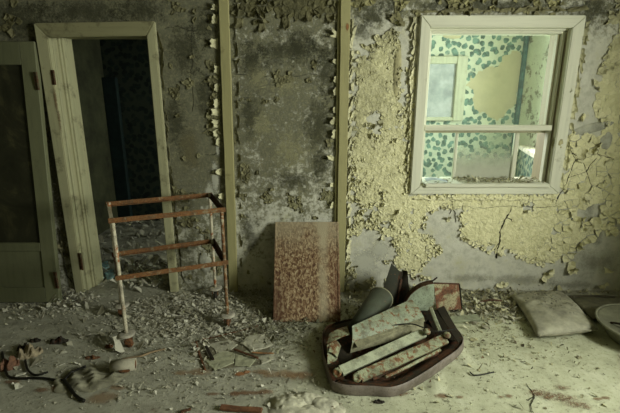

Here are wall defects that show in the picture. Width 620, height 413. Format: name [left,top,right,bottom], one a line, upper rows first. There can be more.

peeling [345,0,620,323]
peeling [14,355,42,389]